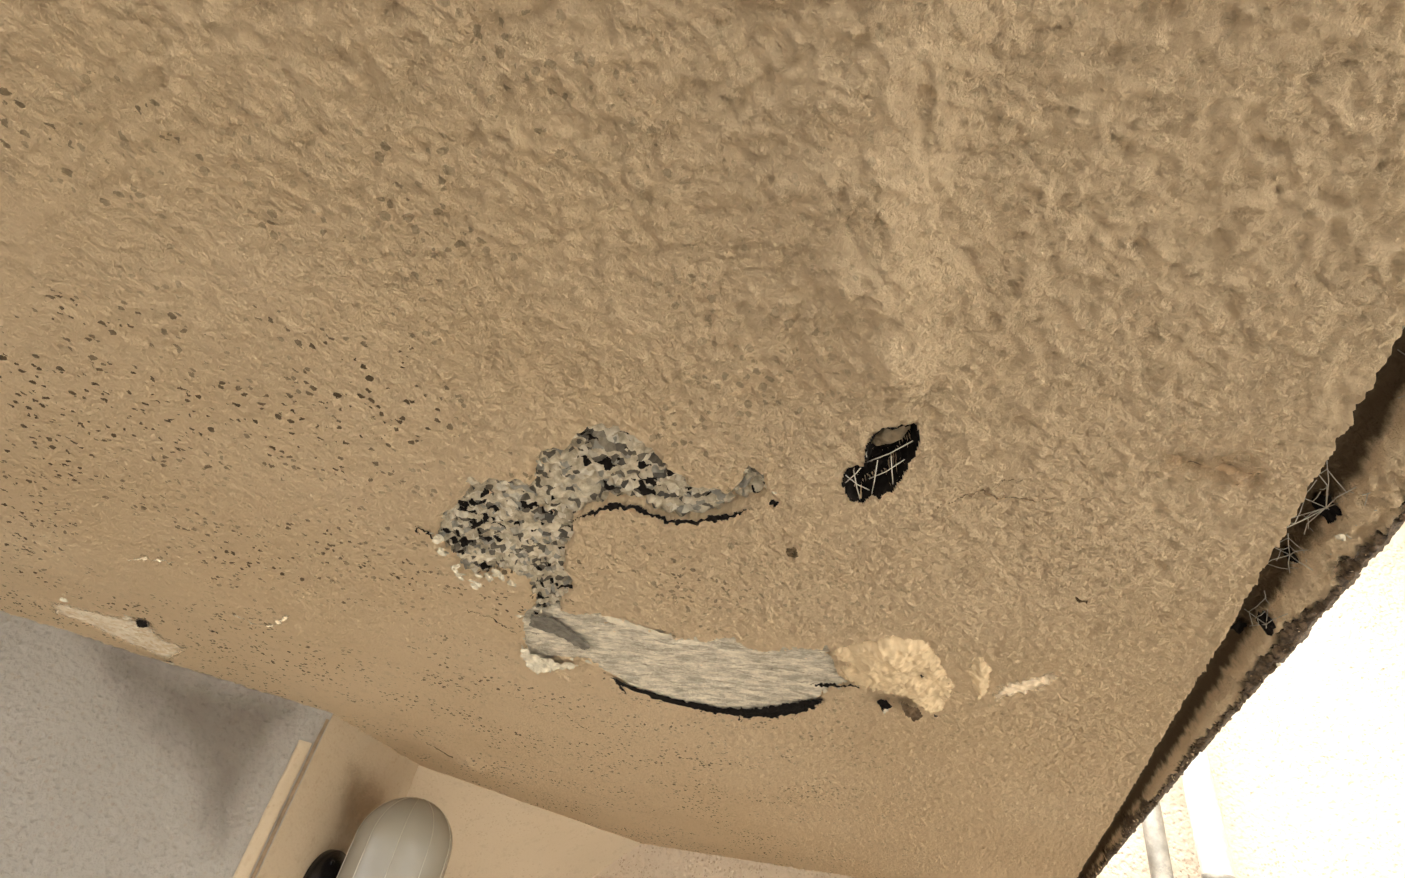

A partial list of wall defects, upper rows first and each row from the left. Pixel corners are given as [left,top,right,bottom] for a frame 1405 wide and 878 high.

spalling [429,423,992,722]
spalling [1231,591,1287,636]
spalling [1268,460,1380,573]